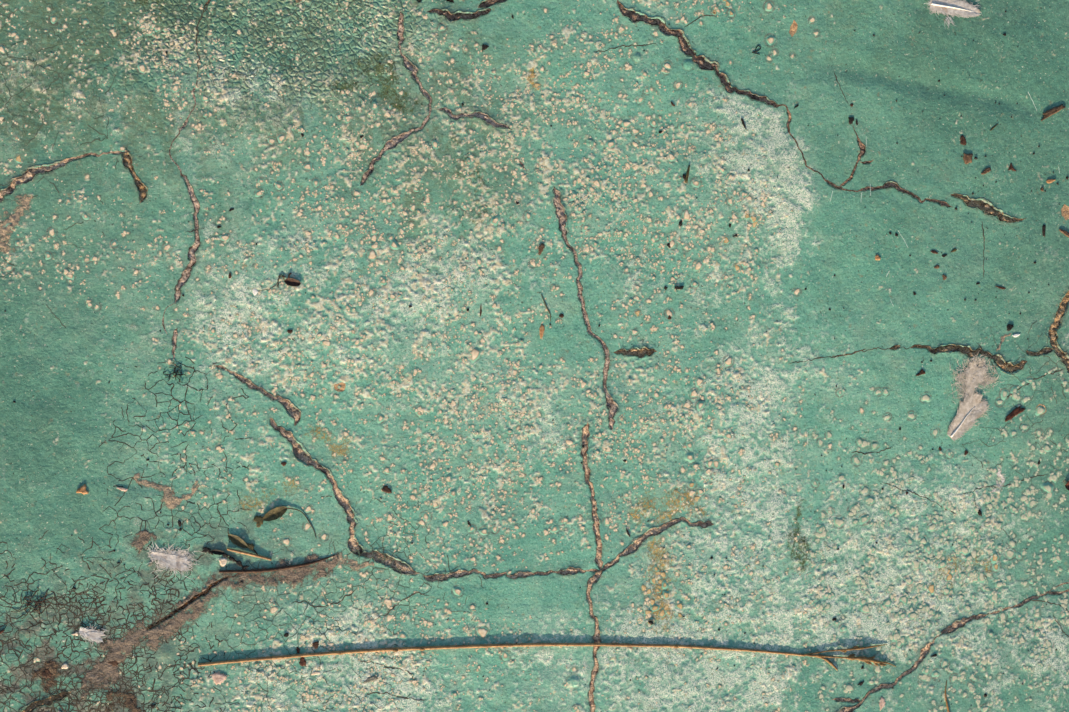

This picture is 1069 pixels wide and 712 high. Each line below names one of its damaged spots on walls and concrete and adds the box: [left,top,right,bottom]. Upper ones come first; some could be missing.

crack [596,0,1027,277]
crack [0,0,714,712]
crack [832,582,1069,712]